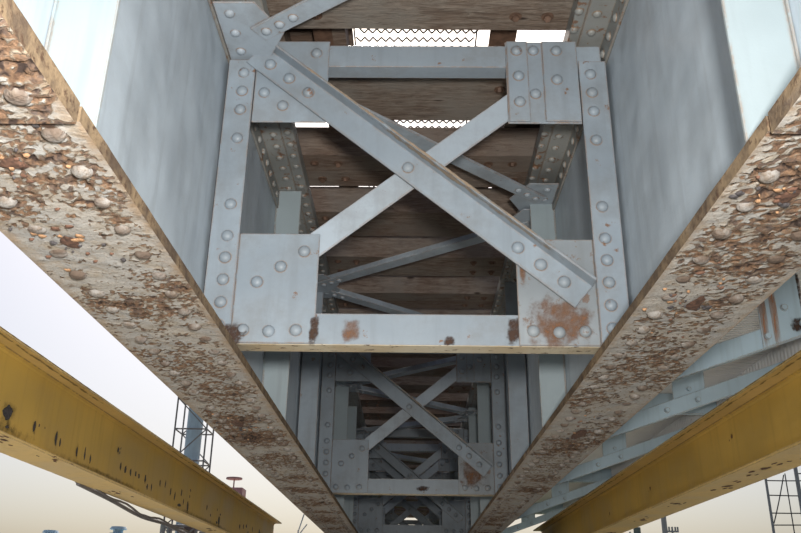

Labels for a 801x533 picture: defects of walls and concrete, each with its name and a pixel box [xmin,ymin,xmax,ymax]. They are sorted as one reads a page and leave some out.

peeling [0,148,35,188]
peeling [772,187,798,214]
peeling [29,225,98,263]
corrosion [309,317,318,343]
corrosion [343,323,358,340]
corrosion [508,319,519,342]
corrosion [538,300,588,346]
peeling [0,405,13,446]
peeling [120,464,191,511]
corrosion [464,463,482,485]